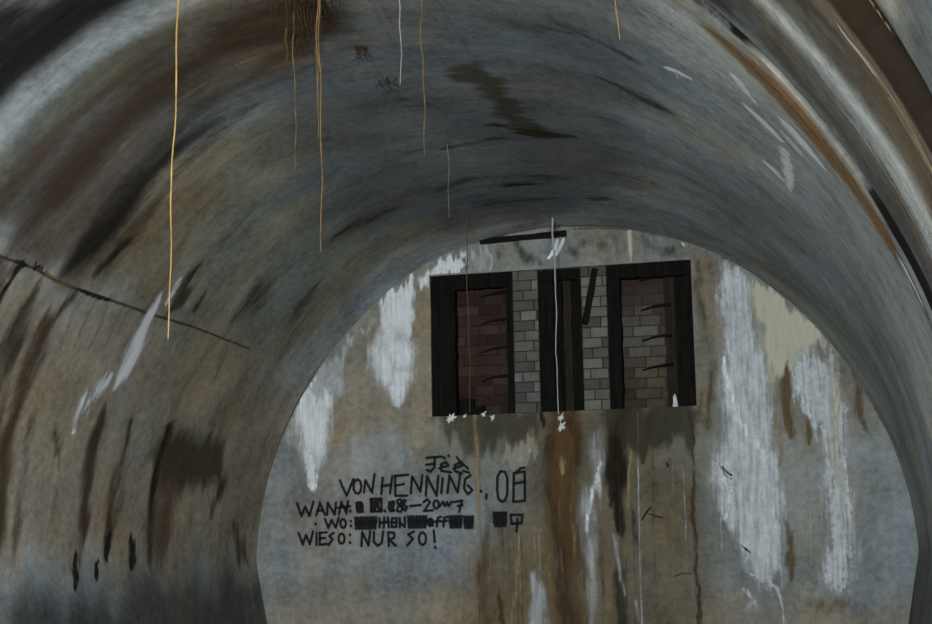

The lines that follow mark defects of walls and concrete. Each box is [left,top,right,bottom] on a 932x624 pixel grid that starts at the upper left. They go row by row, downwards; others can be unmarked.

rust [702,25,932,329]
crack [0,255,250,349]
water stain [148,370,248,562]
water stain [285,245,493,491]
rust [543,411,585,624]
water stain [581,406,696,624]
water stain [710,260,861,619]
rust [780,364,794,438]
rust [785,523,794,580]
rust [855,377,866,427]